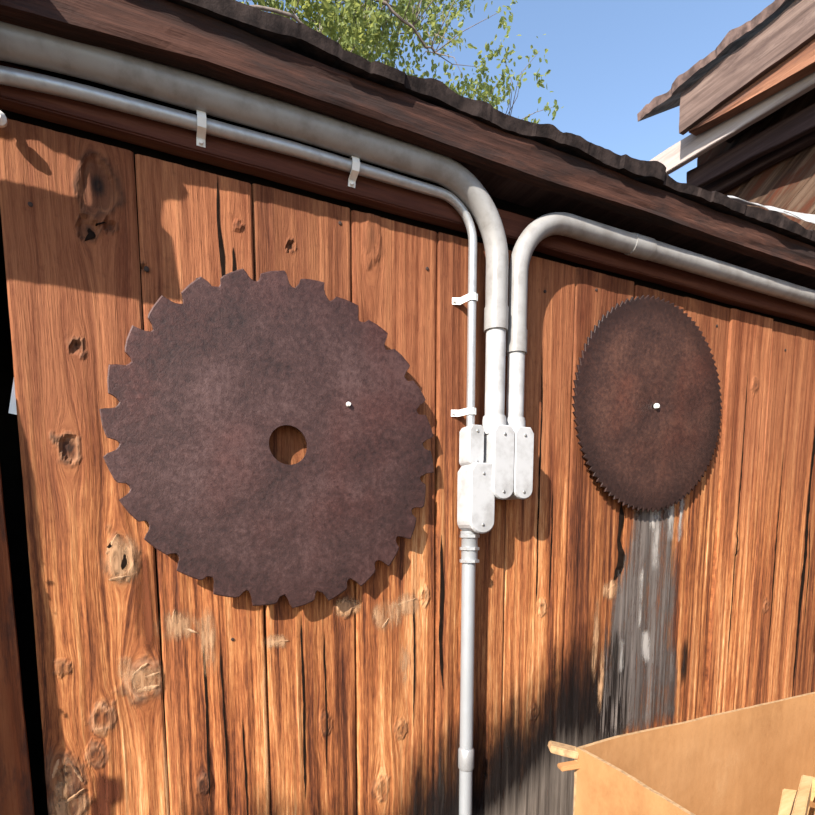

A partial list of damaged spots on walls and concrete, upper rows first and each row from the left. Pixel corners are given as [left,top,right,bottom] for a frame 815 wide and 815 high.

crack [216,177,236,276]
crack [613,502,625,581]
crack [410,600,418,723]
crack [437,538,445,685]
damp [472,498,687,815]
damp [402,730,460,815]